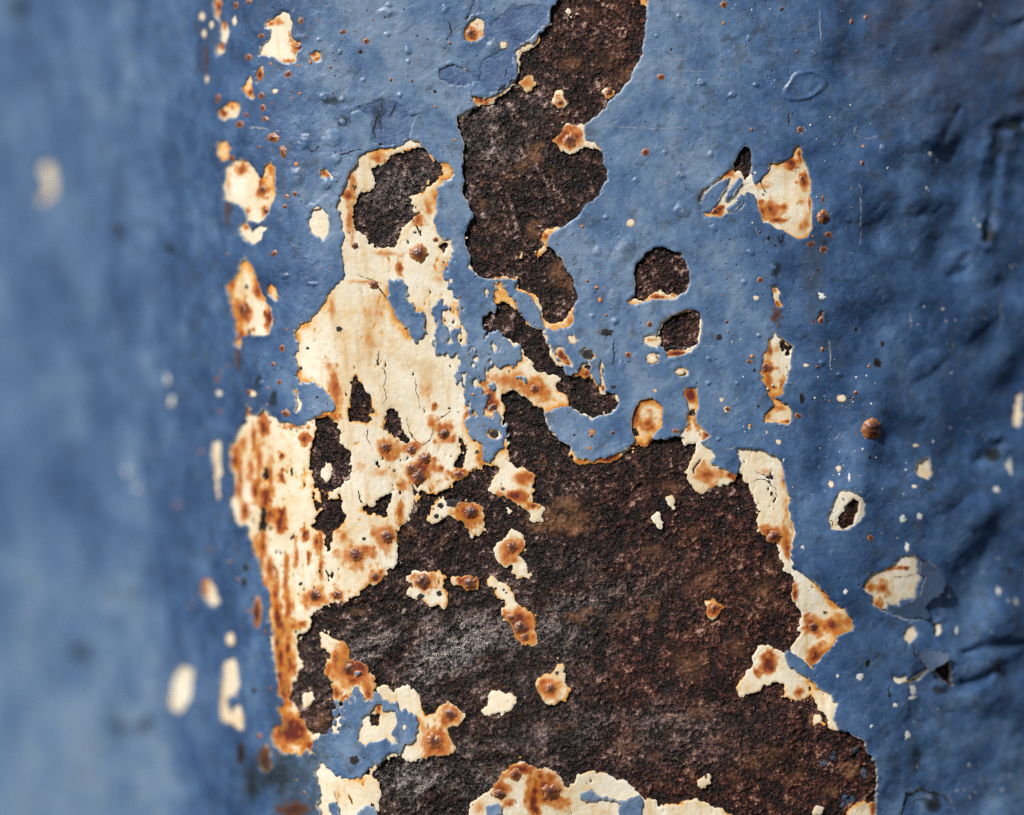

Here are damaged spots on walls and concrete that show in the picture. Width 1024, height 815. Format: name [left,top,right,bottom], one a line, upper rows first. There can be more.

peeling [212,0,877,815]
corrosion [854,417,881,440]
corrosion [246,596,266,634]
peeling [863,555,945,644]